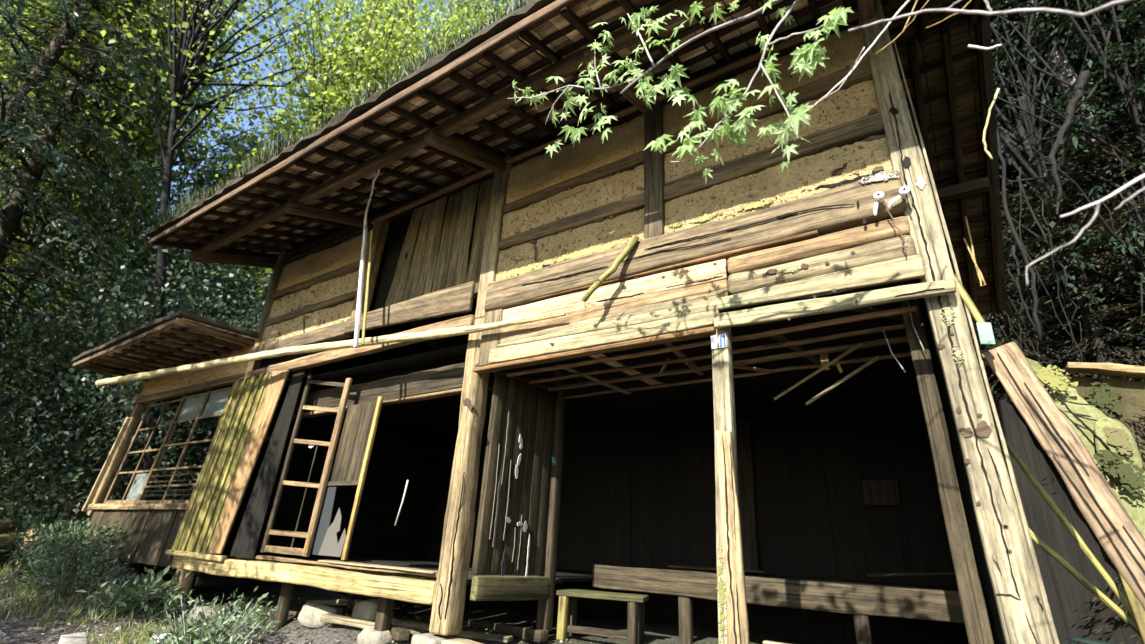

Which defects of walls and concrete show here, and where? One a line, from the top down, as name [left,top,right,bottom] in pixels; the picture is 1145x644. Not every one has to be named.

spalling [665,78,878,178]
spalling [666,134,886,231]
crack [517,94,1043,644]
peeling [515,434,523,479]
peeling [505,517,530,576]